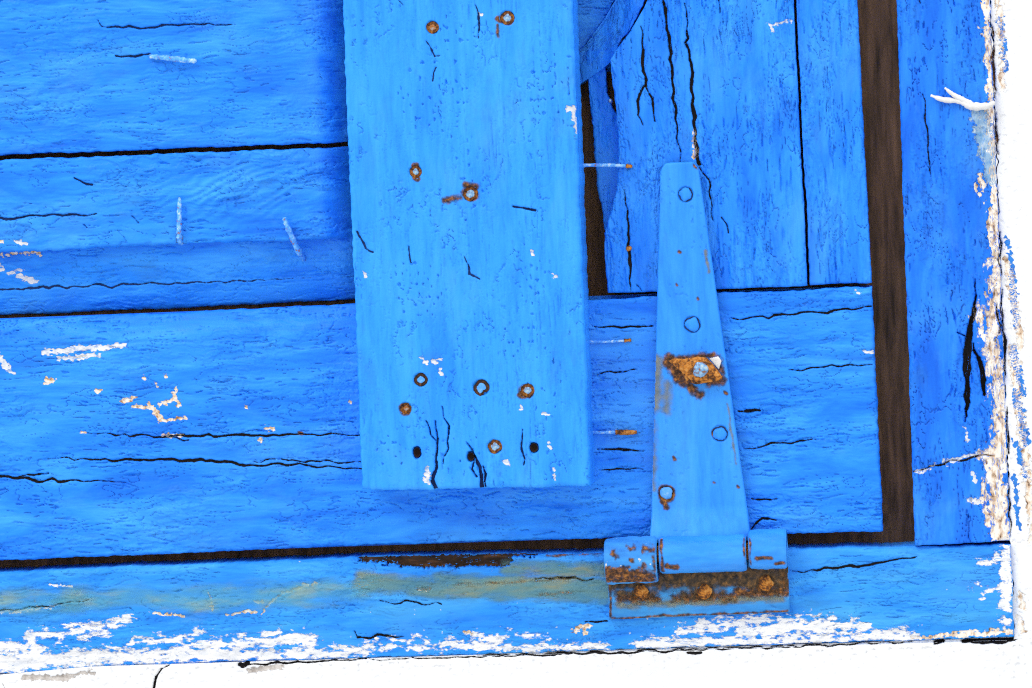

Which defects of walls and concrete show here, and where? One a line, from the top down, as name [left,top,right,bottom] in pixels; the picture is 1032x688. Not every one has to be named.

crack [618,0,729,233]
rust [442,182,479,203]
peeling [0,239,42,284]
peeling [41,342,127,362]
peeling [119,375,187,438]
rust [654,352,729,412]
peeling [629,0,1032,649]
crack [963,238,1007,418]
crack [0,433,362,483]
crack [913,410,1010,472]
rust [605,538,789,619]
peeling [0,614,611,682]